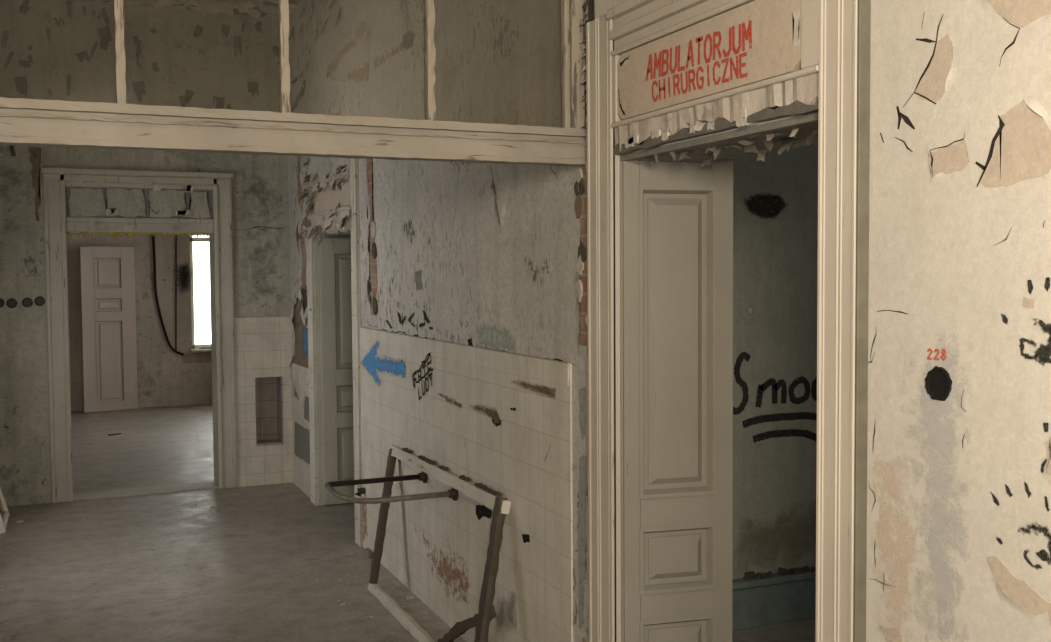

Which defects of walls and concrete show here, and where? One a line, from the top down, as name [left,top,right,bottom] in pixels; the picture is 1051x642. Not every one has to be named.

peeling [125,28,159,103]
peeling [174,0,341,111]
peeling [903,15,957,107]
peeling [976,0,1051,63]
peeling [926,91,1051,187]
spalling [18,146,50,229]
flaking render [365,158,378,321]
spalling [290,156,350,465]
corrosion [423,533,469,601]
damp [742,515,816,560]
peeling [986,556,1051,623]